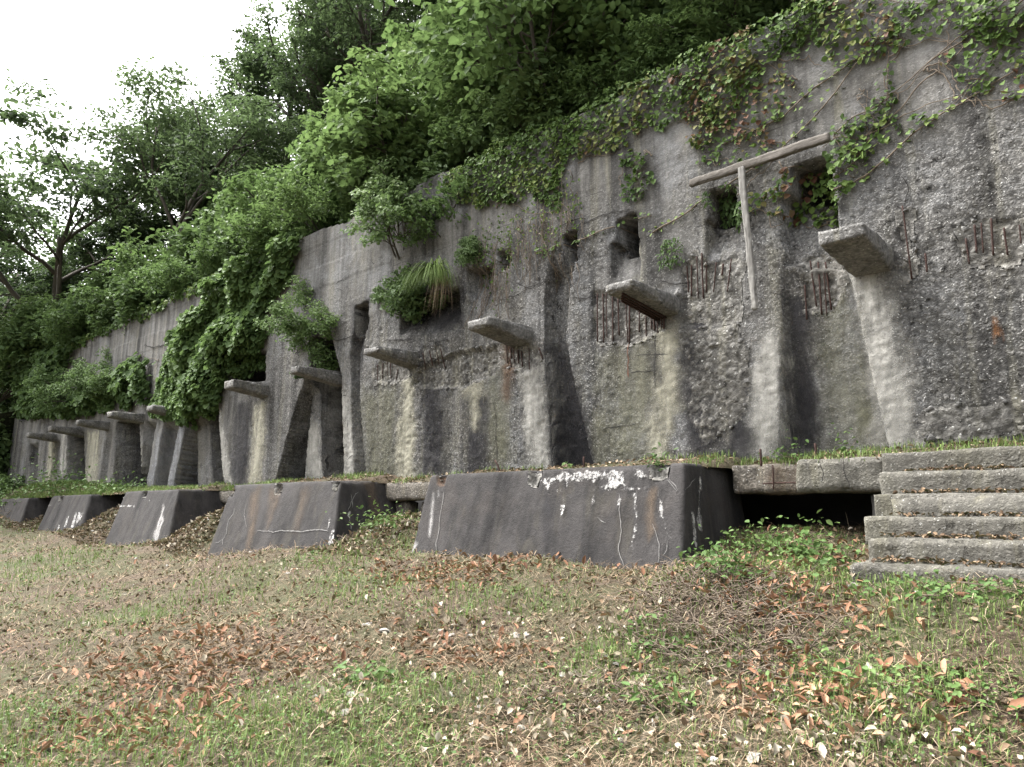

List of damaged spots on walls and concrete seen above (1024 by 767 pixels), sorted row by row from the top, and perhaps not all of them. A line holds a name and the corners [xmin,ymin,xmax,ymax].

crack [216,507,327,544]
leakage [519,347,645,537]
spalling [649,465,671,481]
leakage [727,296,818,457]